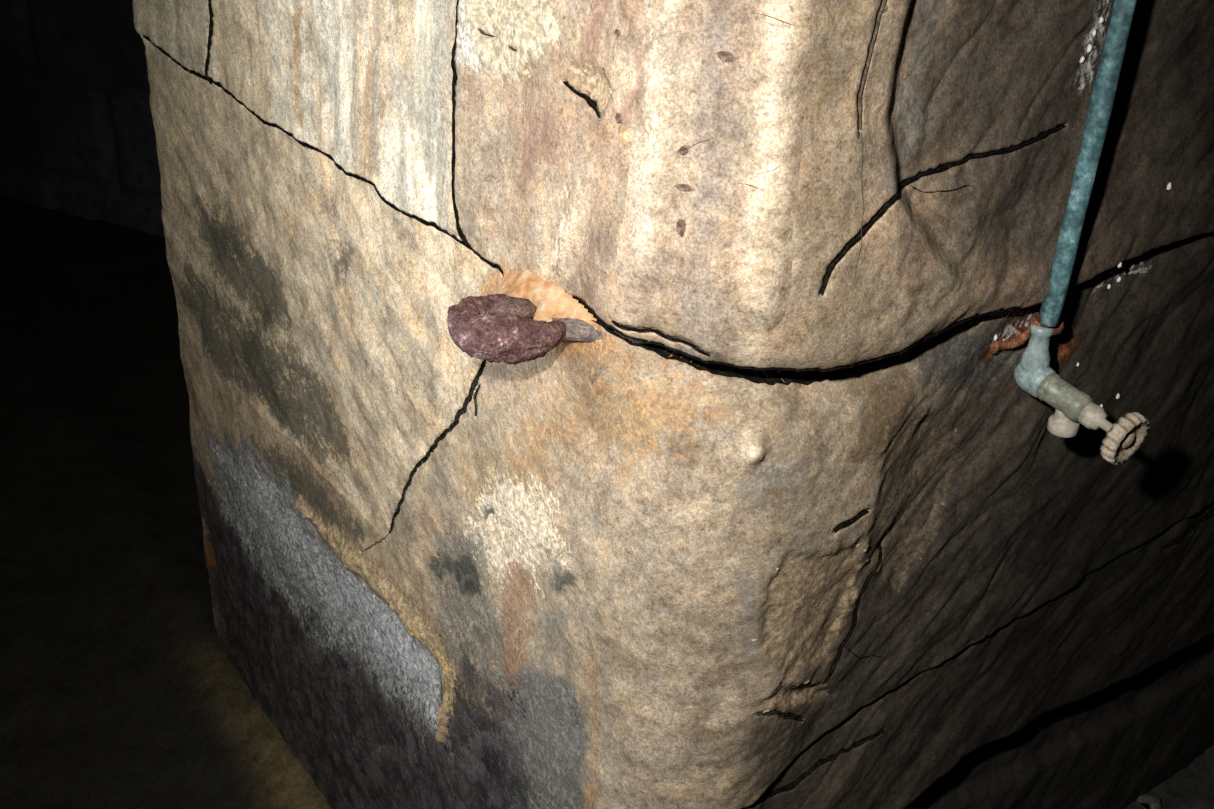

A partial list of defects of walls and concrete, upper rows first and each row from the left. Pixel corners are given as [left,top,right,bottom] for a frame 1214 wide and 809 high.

crack [142,0,517,277]
crack [563,81,602,118]
crack [819,0,1066,296]
damp [1075,0,1111,90]
crack [358,360,486,554]
corrosion [454,323,714,525]
crack [572,297,1018,385]
corrosion [982,317,1030,361]
corrosion [1049,317,1079,368]
peeling [295,492,456,743]